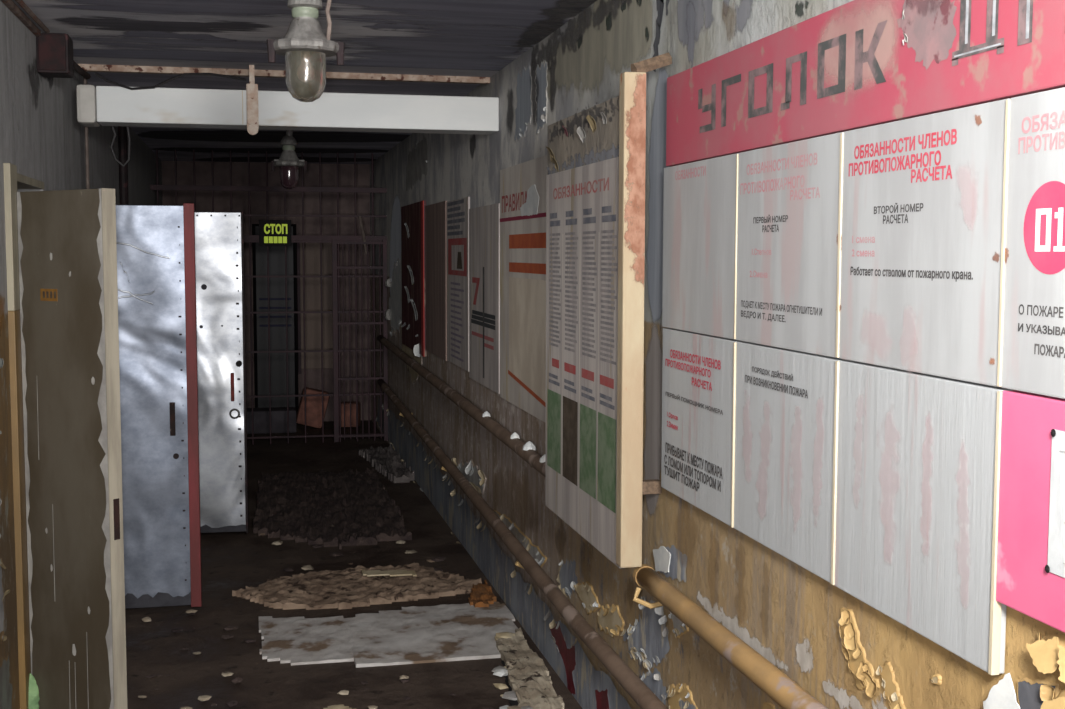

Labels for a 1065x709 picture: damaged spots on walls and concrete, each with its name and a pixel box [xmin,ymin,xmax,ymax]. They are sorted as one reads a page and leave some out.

peeling [376,398,631,709]
peeling [653,545,687,582]
peeling [0,558,13,709]
peeling [28,673,40,709]
peeling [556,558,698,709]
peeling [838,607,907,709]
peeling [983,673,1060,709]